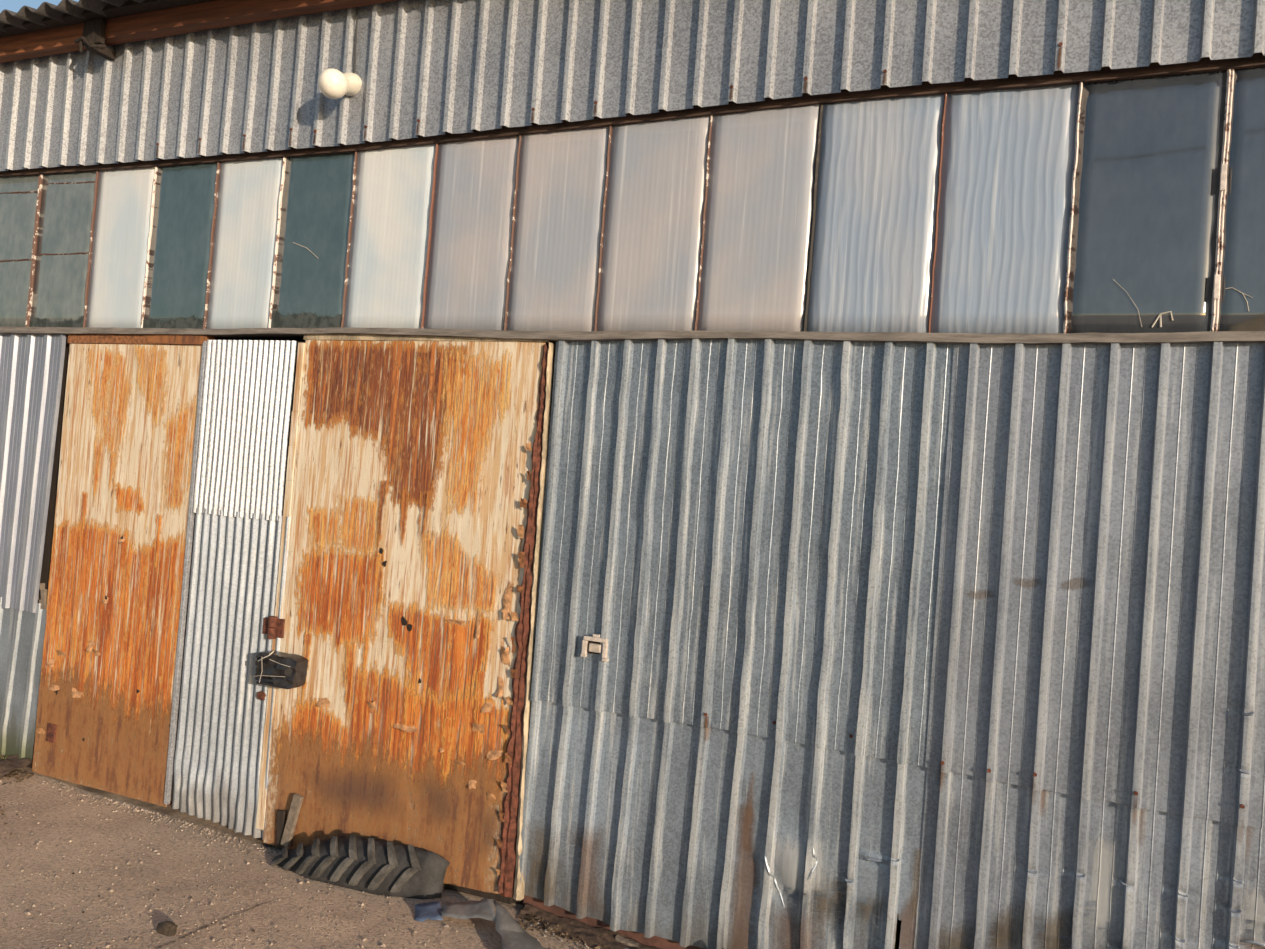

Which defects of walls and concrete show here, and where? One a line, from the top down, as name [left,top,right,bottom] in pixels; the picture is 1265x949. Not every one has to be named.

rust [32,334,204,807]
rust [263,340,514,894]
rust [902,909,912,949]